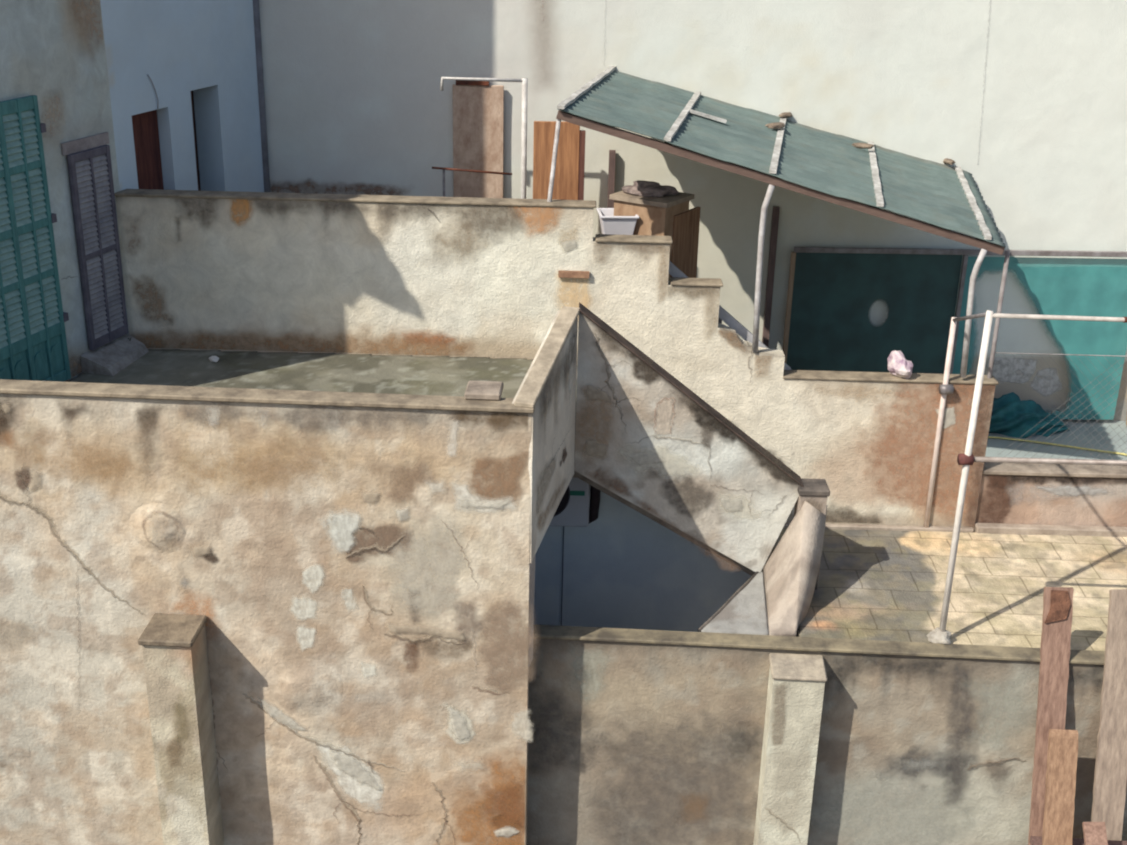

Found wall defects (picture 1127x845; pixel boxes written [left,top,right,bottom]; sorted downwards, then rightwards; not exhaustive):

crack [596,335,626,427]
crack [0,495,145,615]
flaking render [328,509,410,562]
crack [363,587,471,659]
crack [245,694,404,845]
water stain [872,658,1020,794]